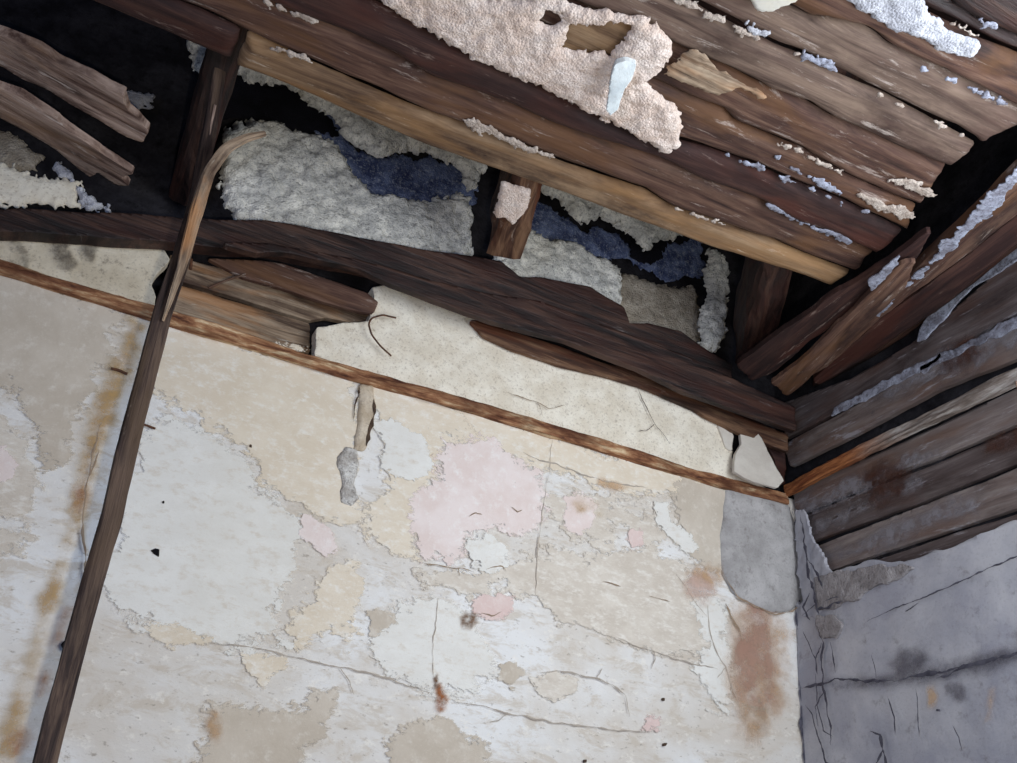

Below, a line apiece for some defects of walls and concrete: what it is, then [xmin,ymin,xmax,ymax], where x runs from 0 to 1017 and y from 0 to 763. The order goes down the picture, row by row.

spalling [0,241,170,305]
peeling [0,275,133,561]
peeling [103,286,784,763]
crack [527,440,646,591]
crack [454,669,646,733]
water stain [735,604,775,707]
crack [622,507,1017,763]